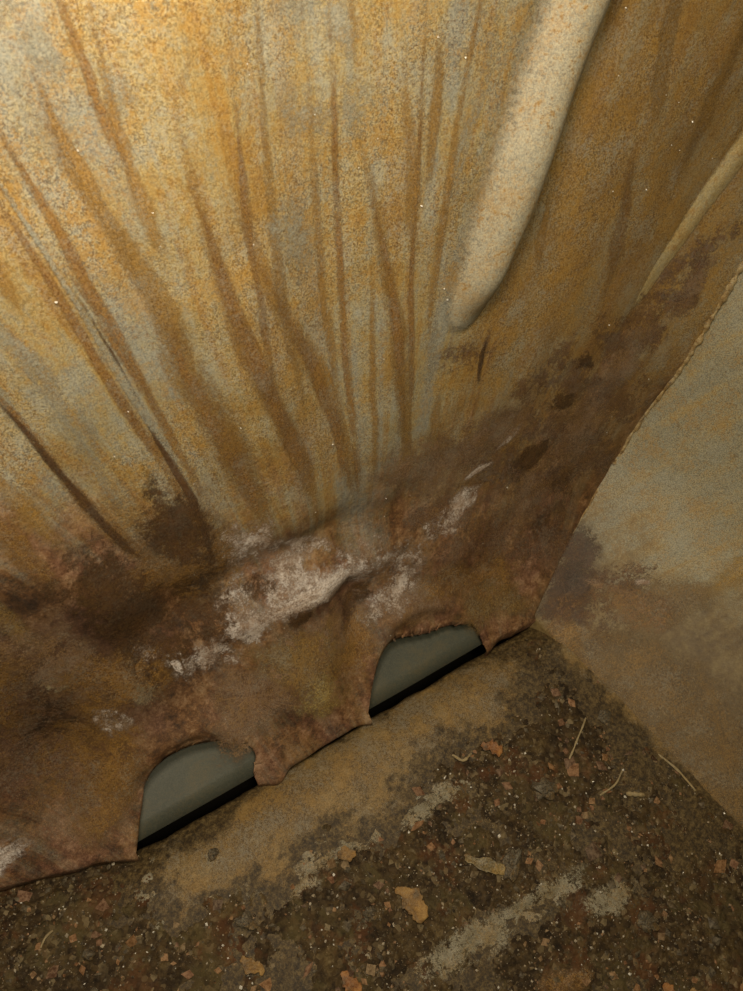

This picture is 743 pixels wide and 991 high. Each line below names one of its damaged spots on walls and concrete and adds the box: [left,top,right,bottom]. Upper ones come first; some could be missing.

corrosion [56,0,162,251]
corrosion [0,4,491,677]
corrosion [181,6,361,509]
corrosion [0,843,25,875]
corrosion [481,739,503,757]